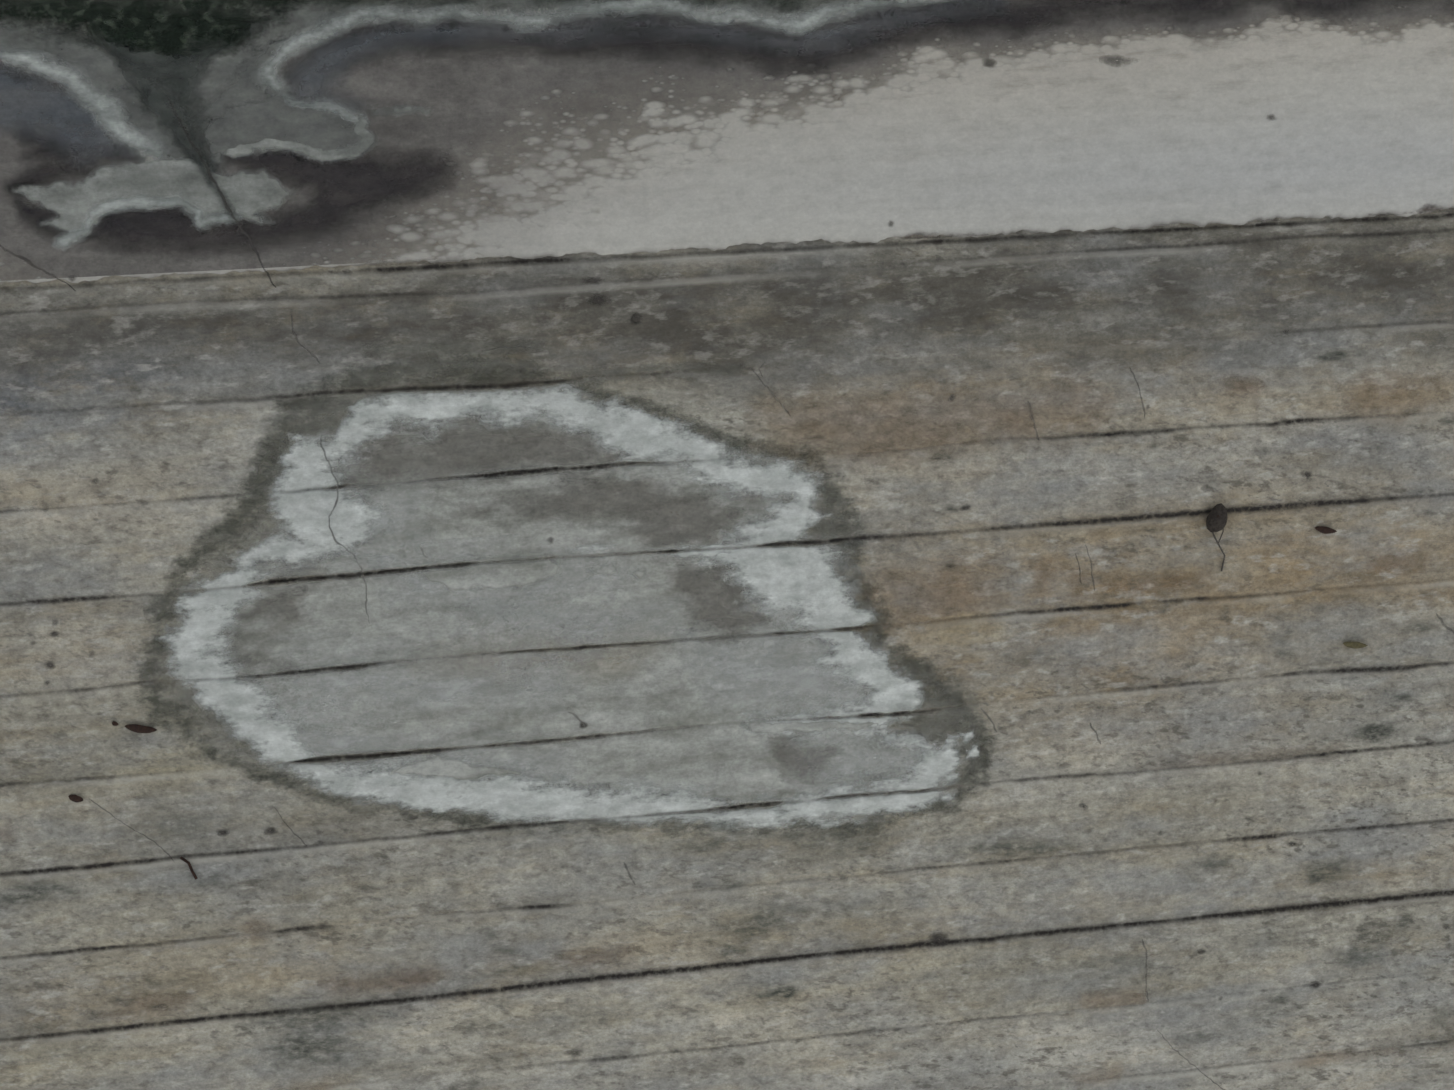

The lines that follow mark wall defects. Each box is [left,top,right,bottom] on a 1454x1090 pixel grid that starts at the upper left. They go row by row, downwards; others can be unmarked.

crack [0,245,76,291]
crack [164,93,318,361]
damp [0,0,1454,281]
crack [320,436,369,617]
damp [140,343,992,839]